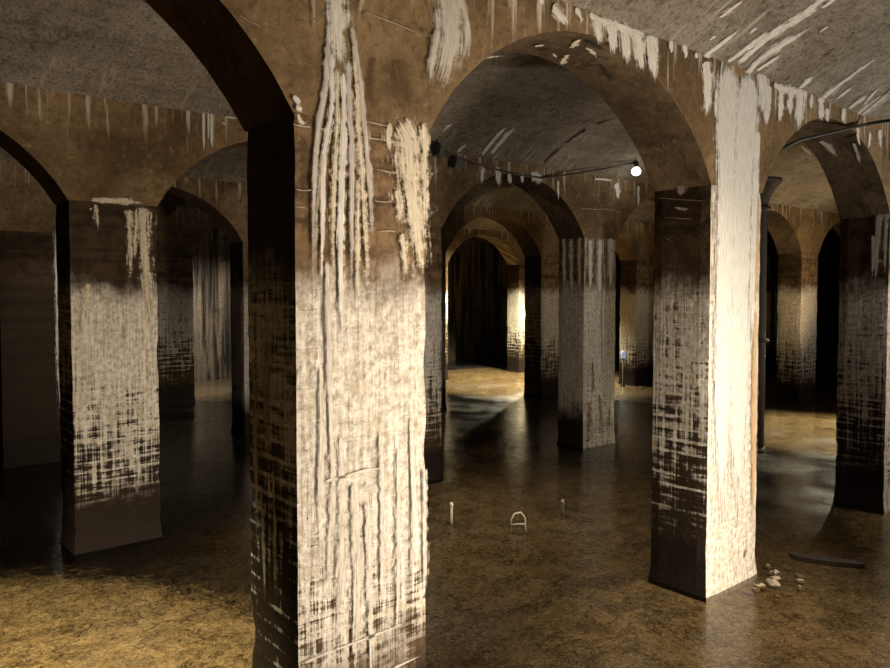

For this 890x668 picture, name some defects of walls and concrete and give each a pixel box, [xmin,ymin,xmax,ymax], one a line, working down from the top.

water stain [841,89,888,121]
water stain [482,127,515,155]
water stain [480,166,542,184]
water stain [852,128,886,162]
water stain [538,0,877,529]
water stain [871,214,889,276]
water stain [305,0,429,668]
water stain [252,329,278,588]